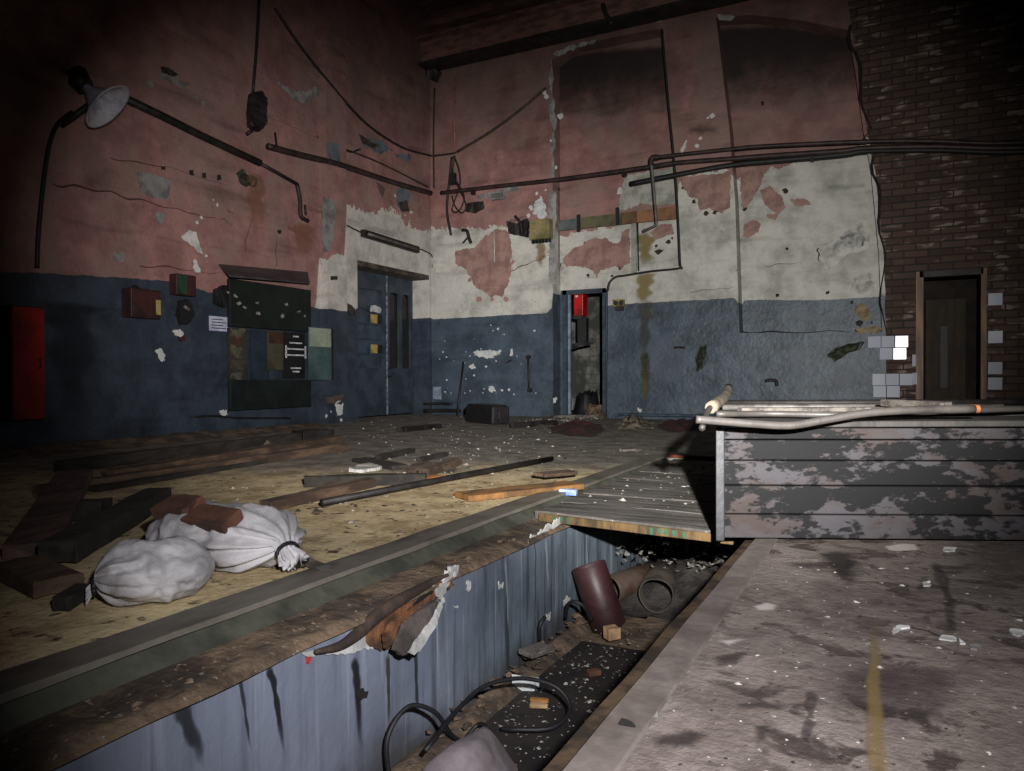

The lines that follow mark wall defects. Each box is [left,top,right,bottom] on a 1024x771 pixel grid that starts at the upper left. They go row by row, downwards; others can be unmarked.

crack [52,158,254,252]
peeling [181,216,207,273]
peeling [455,229,515,302]
peeling [651,224,674,255]
peeling [617,166,811,238]
peeling [433,379,448,399]
peeling [464,348,515,395]
spalling [51,517,683,771]
damp [175,706,201,751]
damp [239,681,249,739]
damp [267,668,283,739]
damp [352,660,361,730]